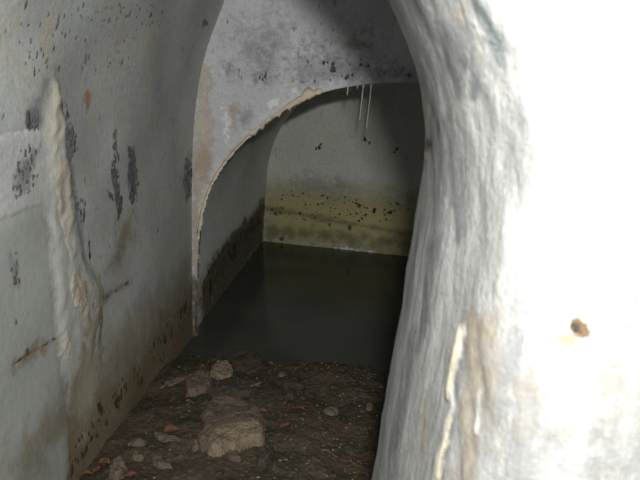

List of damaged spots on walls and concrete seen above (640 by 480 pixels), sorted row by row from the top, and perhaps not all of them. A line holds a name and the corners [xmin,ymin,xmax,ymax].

leakage [314,61,354,83]
leakage [61,101,86,244]
spalling [197,87,323,234]
leakage [67,66,416,480]